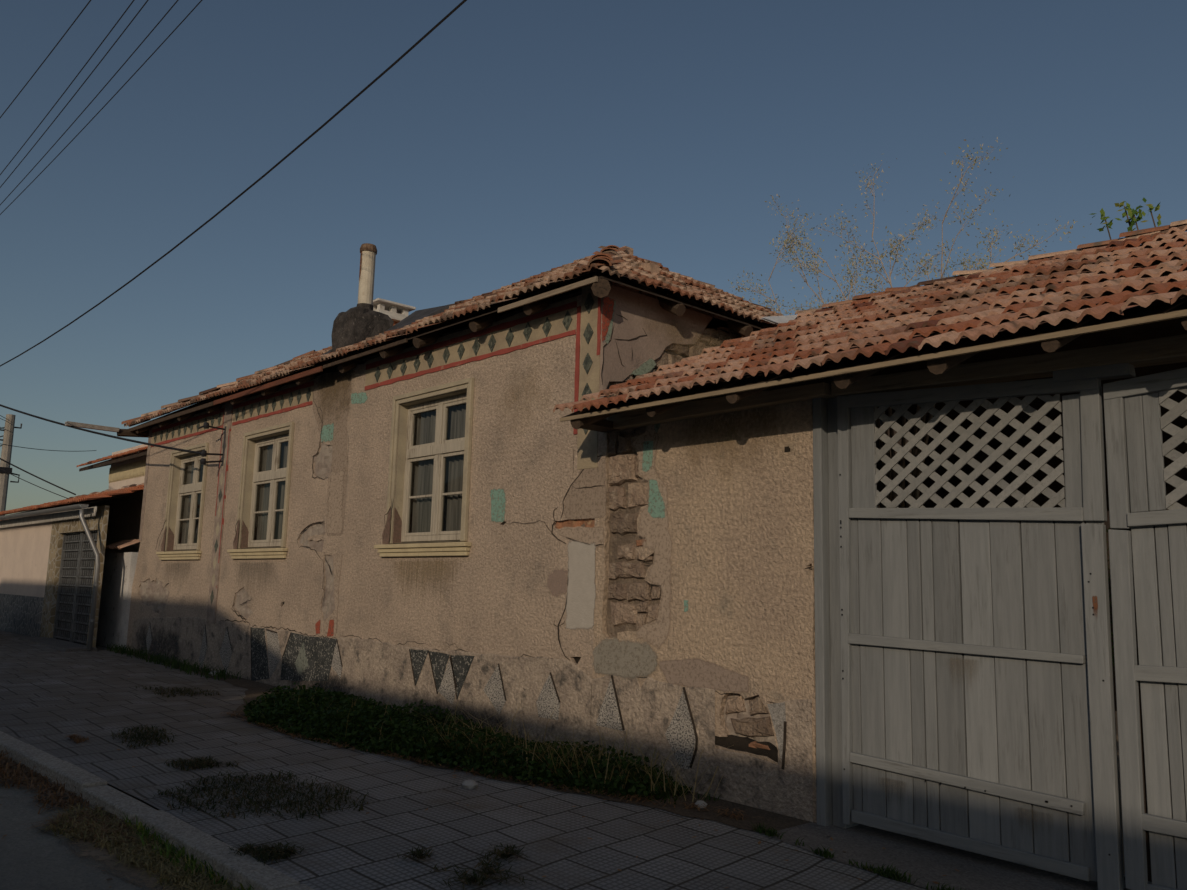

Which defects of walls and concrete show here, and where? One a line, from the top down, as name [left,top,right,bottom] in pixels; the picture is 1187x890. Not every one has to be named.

crack [601,314,647,385]
peeling [299,370,367,637]
peeling [555,455,606,547]
peeling [632,425,688,648]
spalling [715,693,778,762]